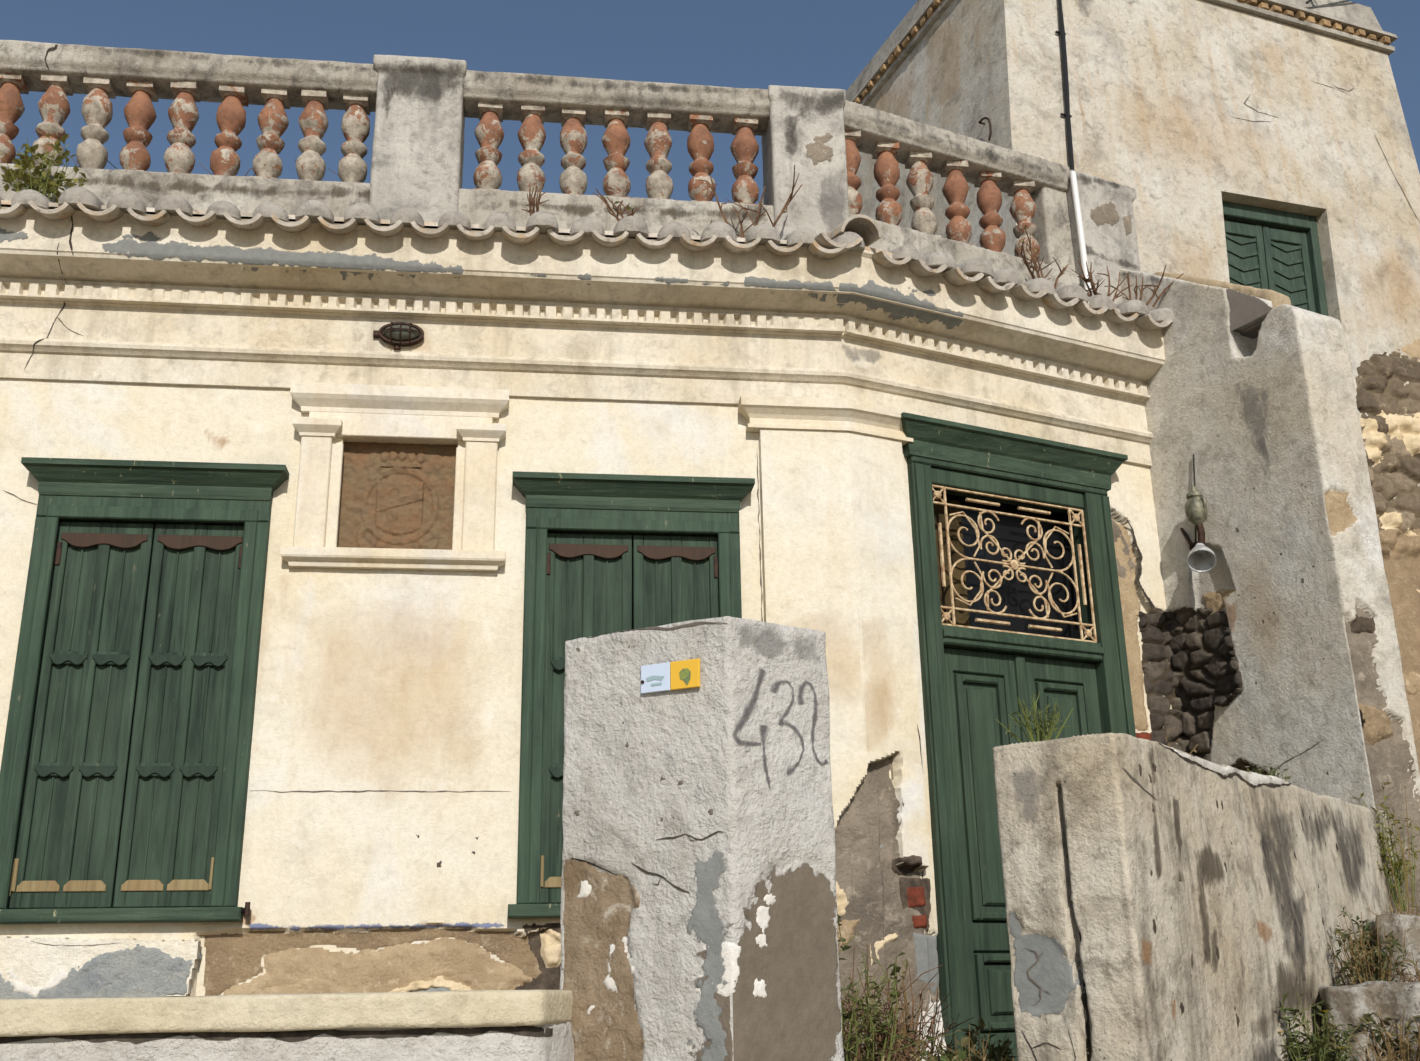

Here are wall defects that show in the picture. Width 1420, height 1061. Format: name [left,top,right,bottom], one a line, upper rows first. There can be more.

peeling [686,752,946,1061]